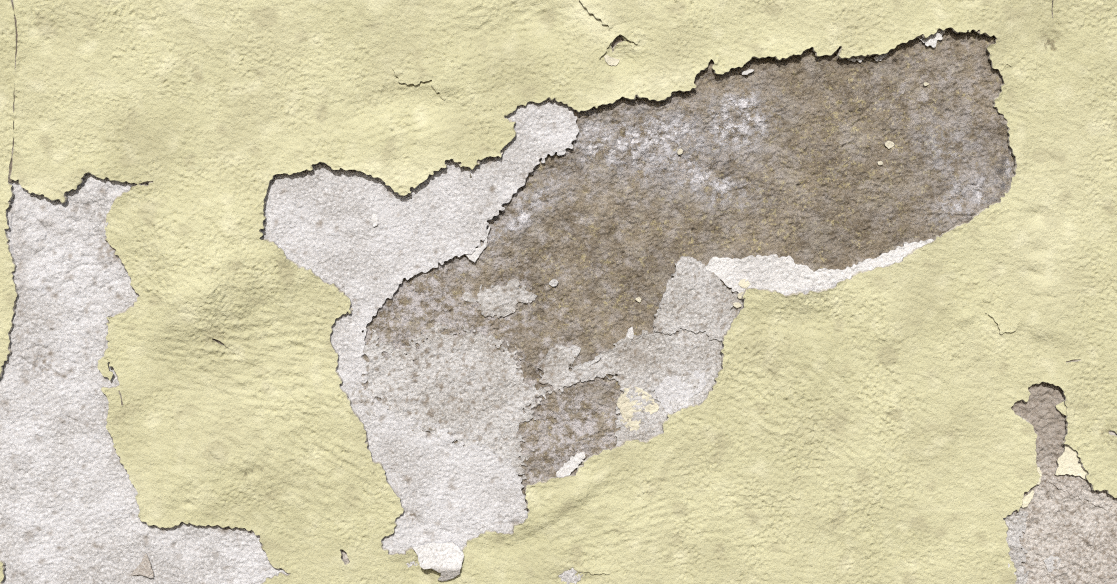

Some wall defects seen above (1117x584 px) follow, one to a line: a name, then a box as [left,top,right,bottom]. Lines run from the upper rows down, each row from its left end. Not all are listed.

flaking render [0,173,288,584]
flaking render [259,22,1015,584]
flaking render [1003,382,1117,584]